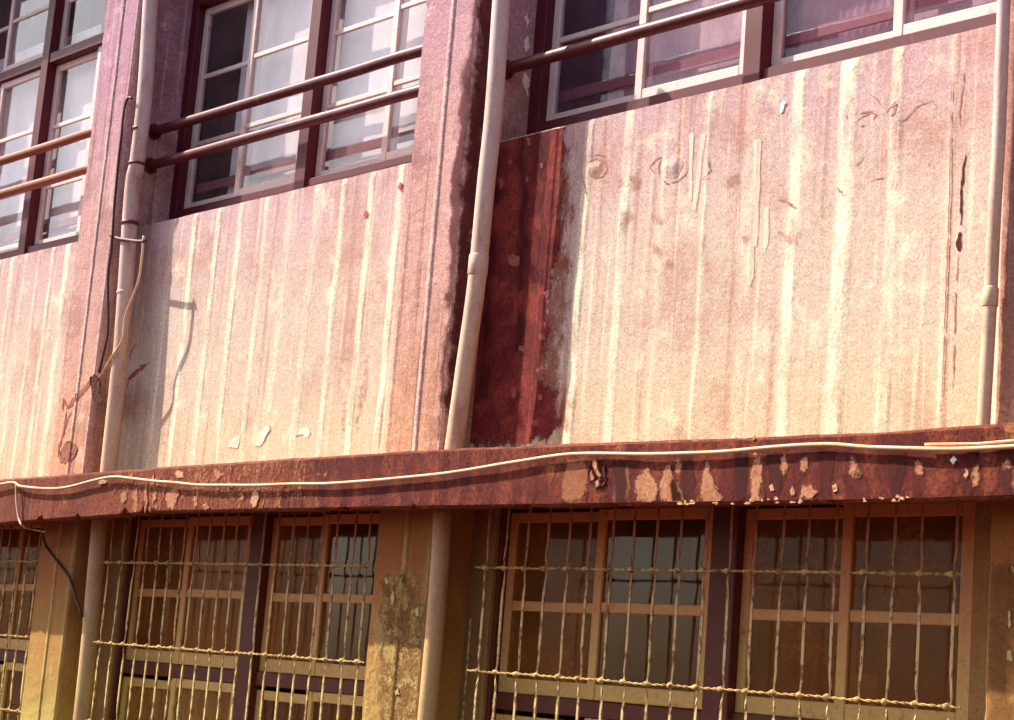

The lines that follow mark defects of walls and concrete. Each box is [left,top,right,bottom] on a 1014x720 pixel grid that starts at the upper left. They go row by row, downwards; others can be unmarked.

peeling [522,73,530,96]
damp [436,0,492,438]
crack [845,70,966,386]
damp [274,127,1014,508]
spalling [89,374,102,405]
spalling [59,441,77,463]
peeling [613,453,818,505]
peeling [849,457,861,478]
peeling [950,456,980,487]
peeling [365,577,424,720]